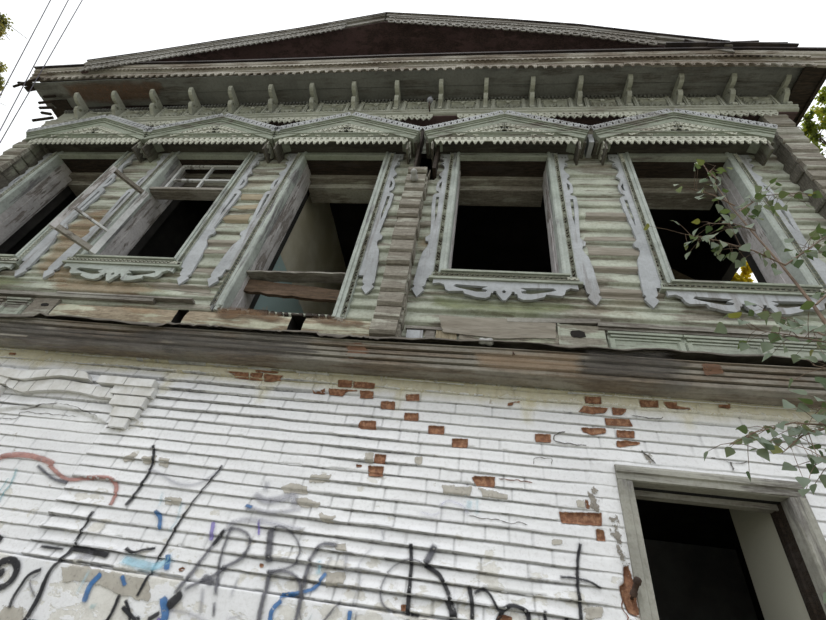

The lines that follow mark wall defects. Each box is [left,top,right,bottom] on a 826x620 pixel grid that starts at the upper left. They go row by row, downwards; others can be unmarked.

spalling [225,370,283,382]
spalling [313,380,395,410]
crack [3,403,116,429]
spalling [358,420,376,430]
spalling [404,413,419,421]
spalling [428,425,468,448]
spalling [535,433,551,442]
spalling [578,396,640,447]
spalling [356,452,386,477]
spalling [559,487,640,620]